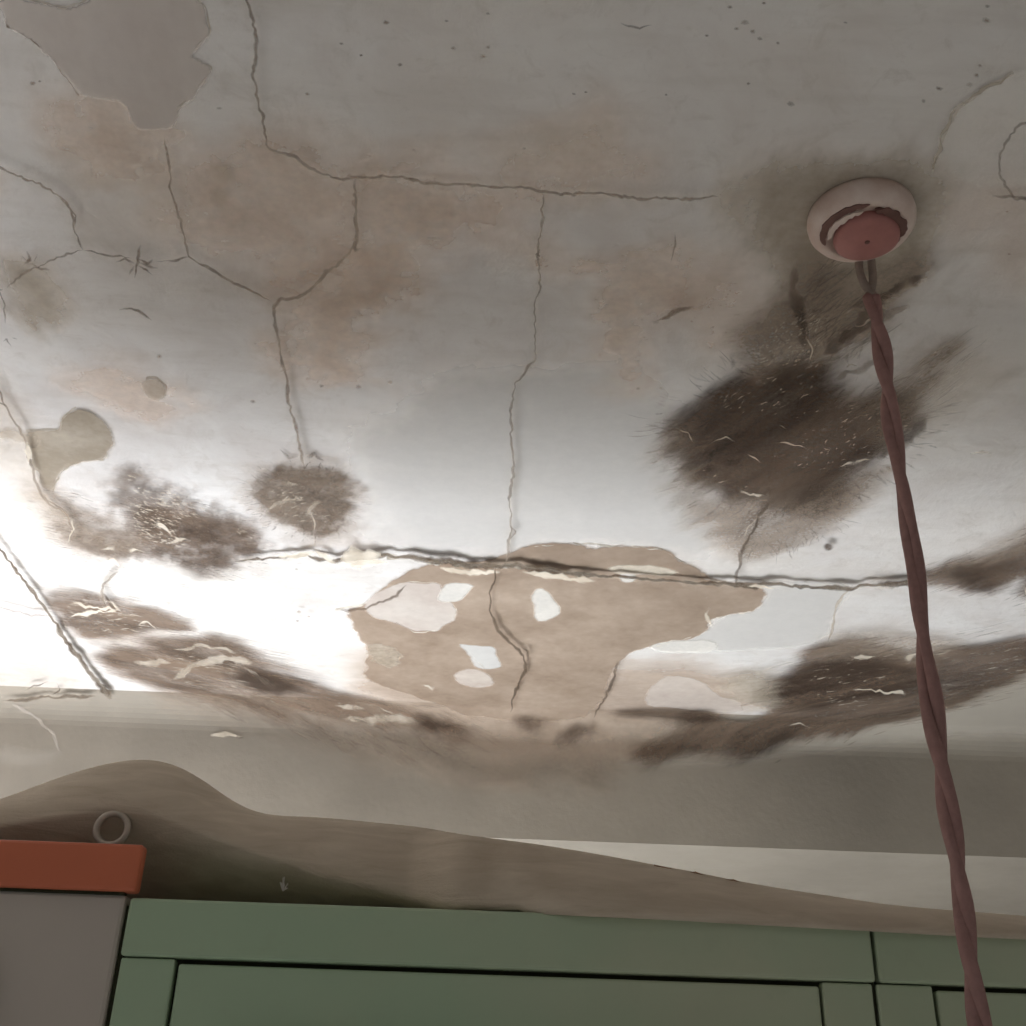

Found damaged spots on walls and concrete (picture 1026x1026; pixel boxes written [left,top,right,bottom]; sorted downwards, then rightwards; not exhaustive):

peeling [0,0,212,130]
crack [996,122,1026,201]
water stain [0,258,70,334]
crack [0,0,908,717]
water stain [26,137,971,588]
peeling [0,407,114,493]
water stain [35,579,922,786]
peeling [335,542,766,721]
water stain [926,527,1026,606]
water stain [930,624,1026,712]